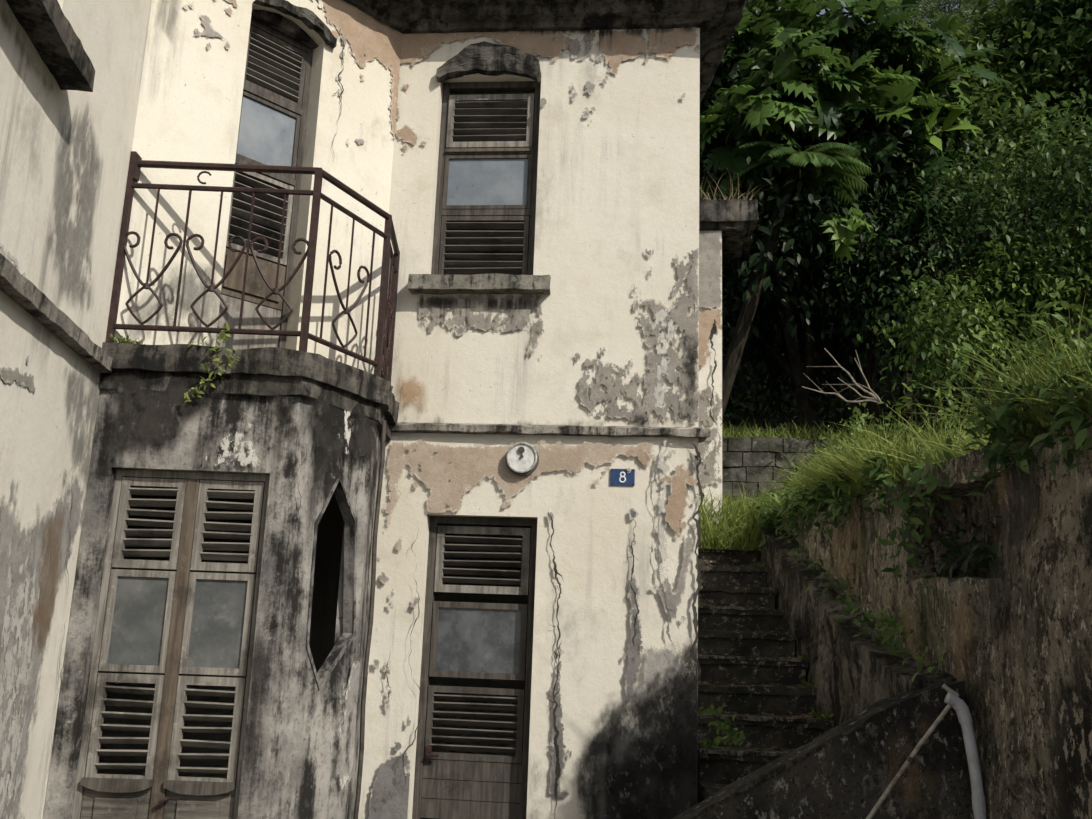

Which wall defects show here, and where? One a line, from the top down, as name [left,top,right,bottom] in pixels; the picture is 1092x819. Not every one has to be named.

crack [332,29,346,157]
peeling [312,0,700,153]
leakage [52,115,99,300]
peeling [205,416,259,468]
leakage [312,393,378,480]
peeling [384,231,722,730]
crack [709,319,717,422]
crack [626,441,705,682]
flaking render [368,742,410,819]
crack [547,512,565,818]
leakage [577,641,698,819]
leakage [1049,673,1092,819]